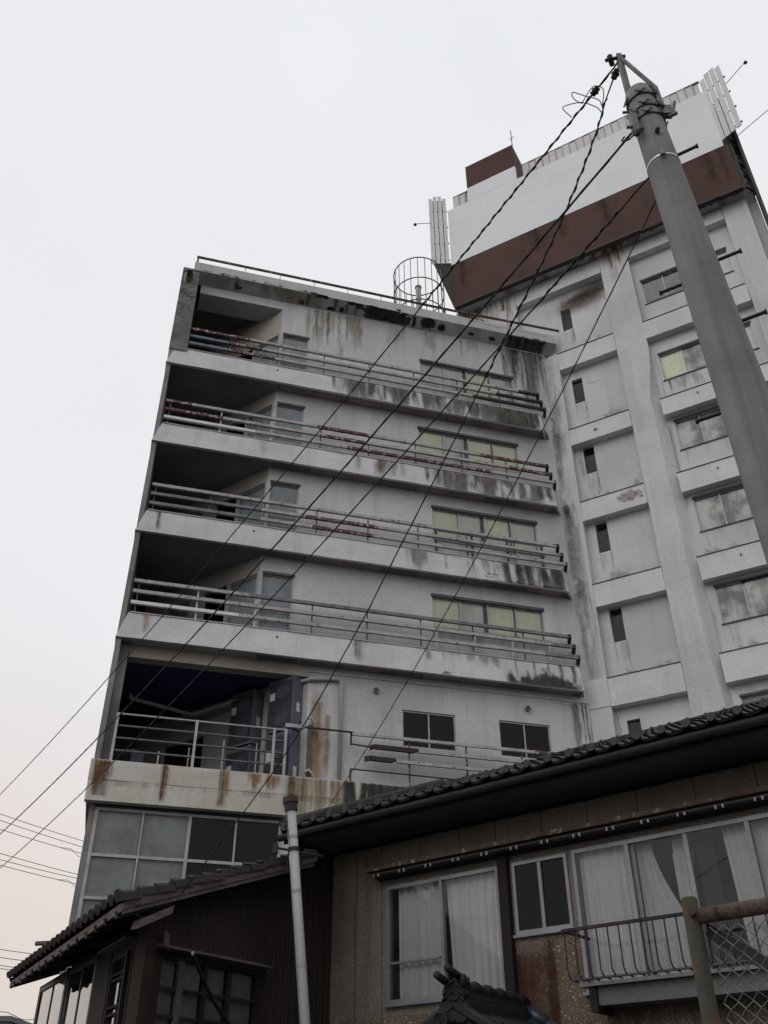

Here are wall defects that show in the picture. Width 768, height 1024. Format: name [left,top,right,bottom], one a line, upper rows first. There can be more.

damp [333,376,539,428]
damp [426,467,552,502]
damp [498,563,565,590]
damp [508,662,579,689]
rust [92,759,111,794]
rust [218,770,229,802]
rust [250,710,341,812]